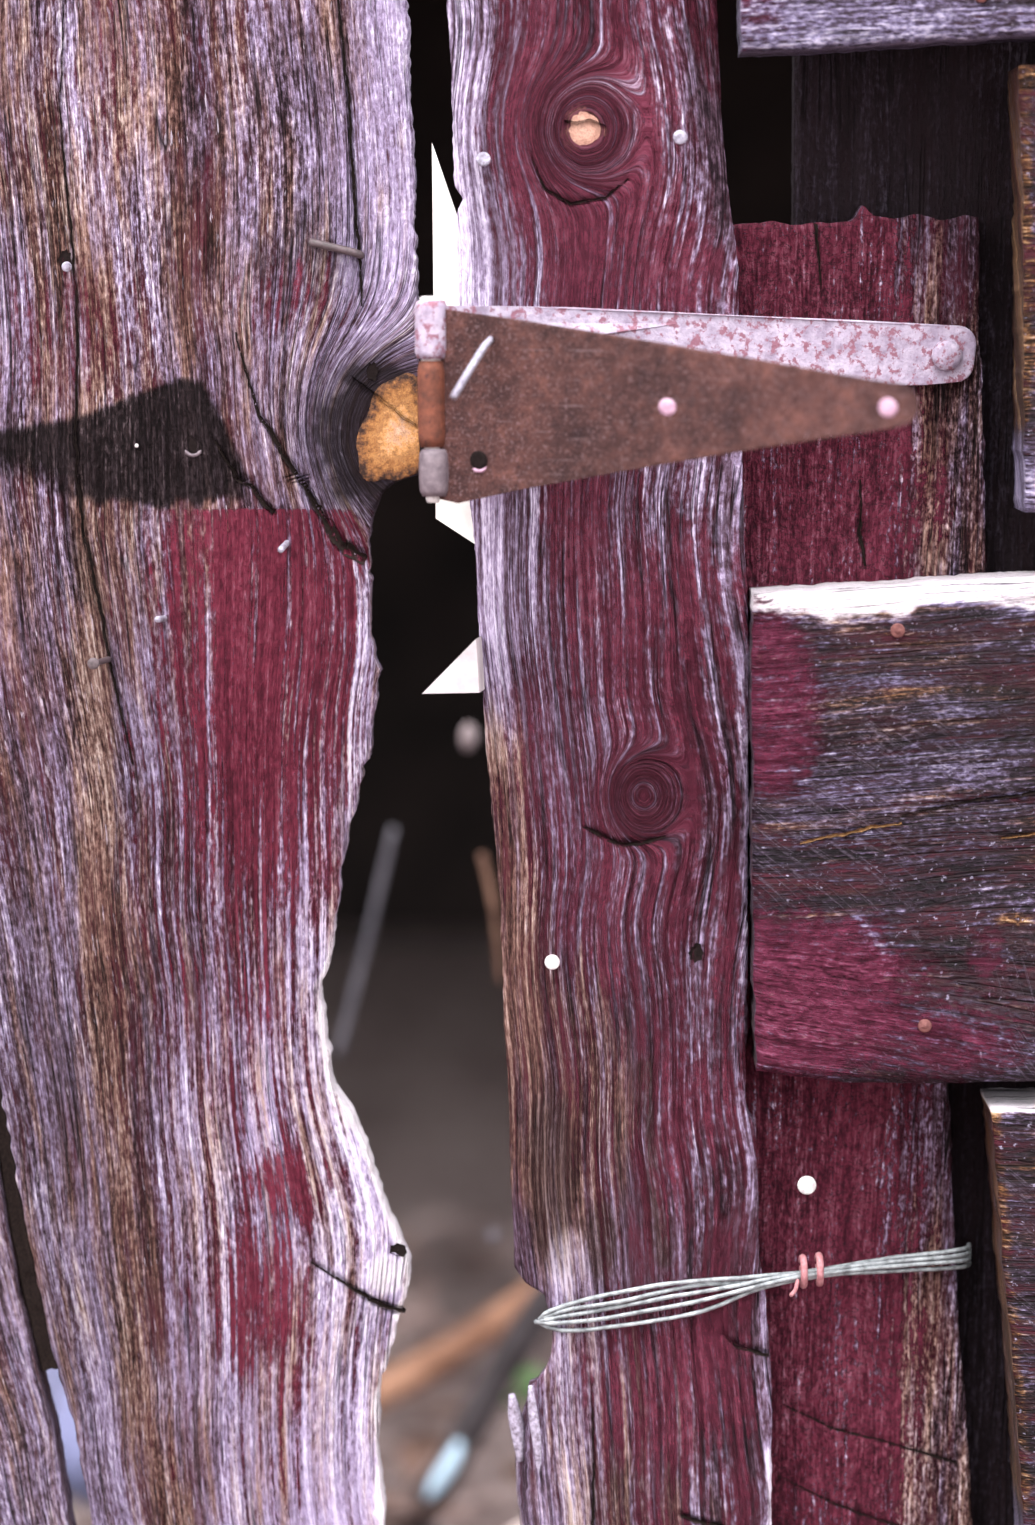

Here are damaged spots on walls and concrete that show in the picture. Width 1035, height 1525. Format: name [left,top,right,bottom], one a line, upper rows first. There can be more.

crack [214,332,368,565]
crack [582,826,669,848]
crack [800,791,1035,844]
crack [0,1086,58,1372]
crack [311,1262,406,1313]
crack [782,1404,956,1464]
crack [778,1476,899,1525]